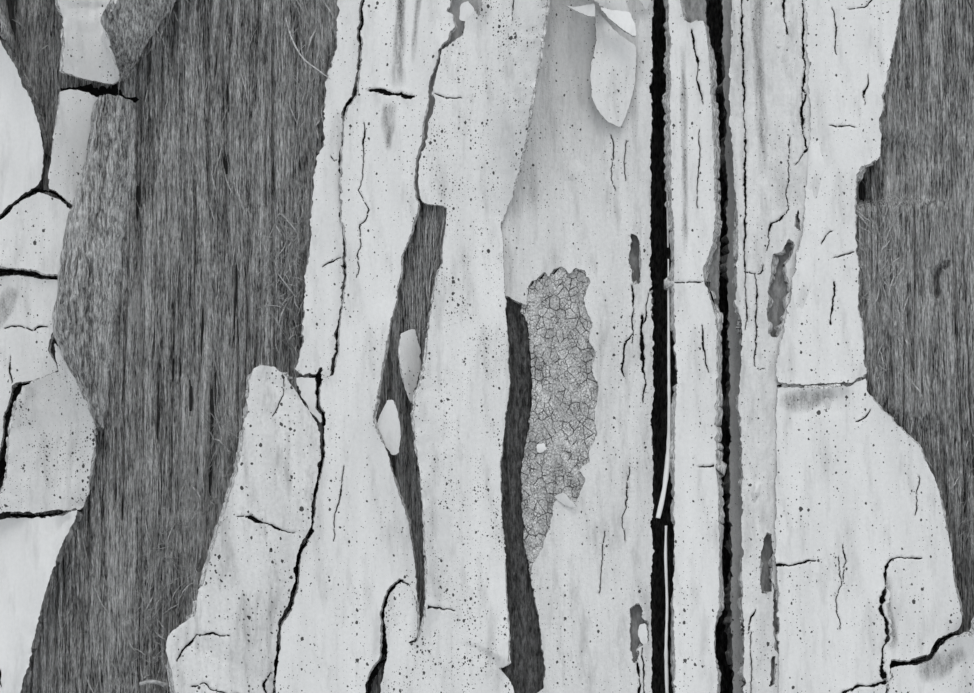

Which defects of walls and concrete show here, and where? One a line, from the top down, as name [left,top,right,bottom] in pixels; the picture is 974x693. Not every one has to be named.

peeling [565,0,636,127]
crack [691,30,703,100]
crack [324,0,461,278]
peeling [0,0,339,693]
crack [672,281,716,372]
peeling [855,0,974,693]
peeling [376,199,446,643]
peeling [365,627,388,693]
crack [748,609,756,684]
crack [776,559,812,567]
crack [842,557,960,693]